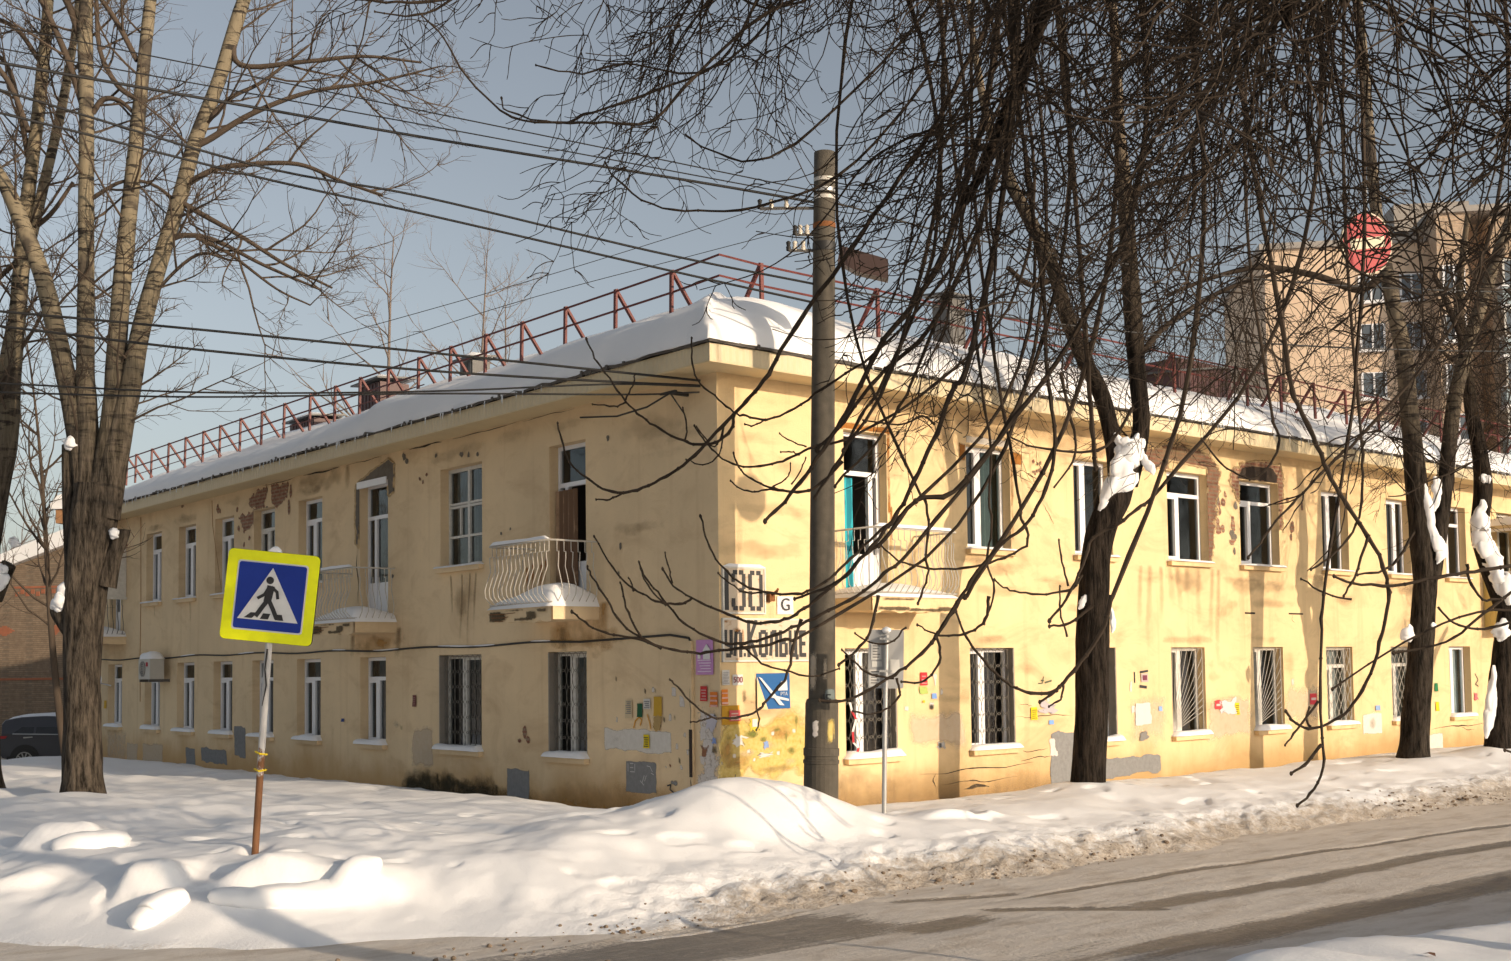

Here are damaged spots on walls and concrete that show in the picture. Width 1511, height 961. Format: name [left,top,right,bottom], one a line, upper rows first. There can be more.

peeling [216,481,292,547]